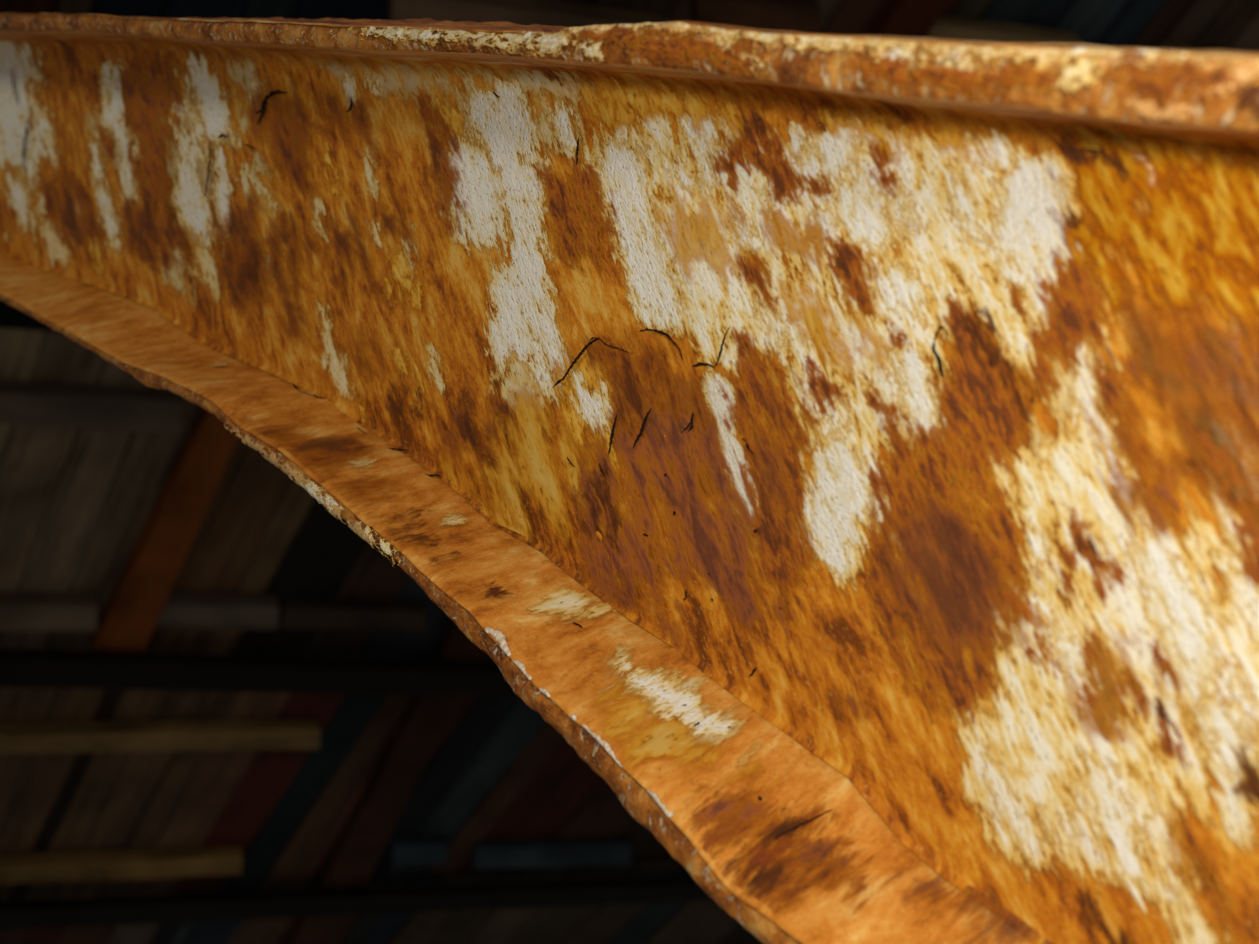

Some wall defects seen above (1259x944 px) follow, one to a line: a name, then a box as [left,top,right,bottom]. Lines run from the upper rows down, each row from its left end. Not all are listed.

peeling [0,40,284,307]
corrosion [99,51,189,277]
corrosion [210,79,381,344]
corrosion [818,107,986,198]
corrosion [1101,51,1259,121]
corrosion [256,420,374,471]
corrosion [334,23,907,641]
peeling [311,22,1259,944]
corrosion [861,123,1259,727]
corrosion [691,786,874,913]
corrosion [1070,626,1194,770]
corrosion [1233,745,1259,803]